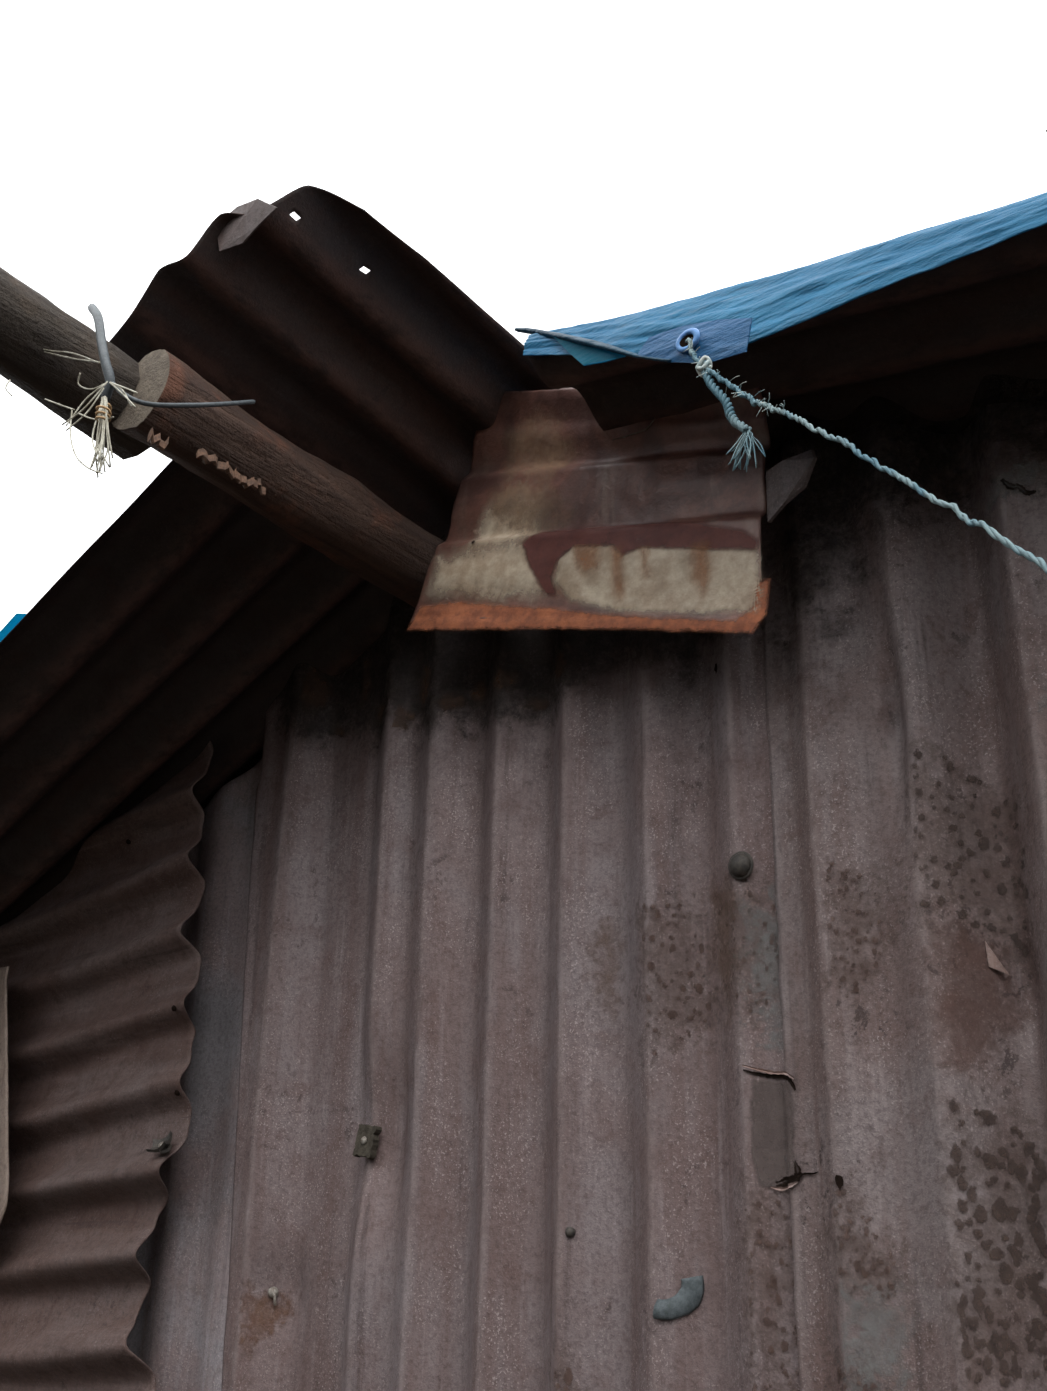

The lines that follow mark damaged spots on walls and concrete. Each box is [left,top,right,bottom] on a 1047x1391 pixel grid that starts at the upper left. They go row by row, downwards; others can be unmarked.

rust [408,522,769,633]
rust [946,1100,1047,1388]